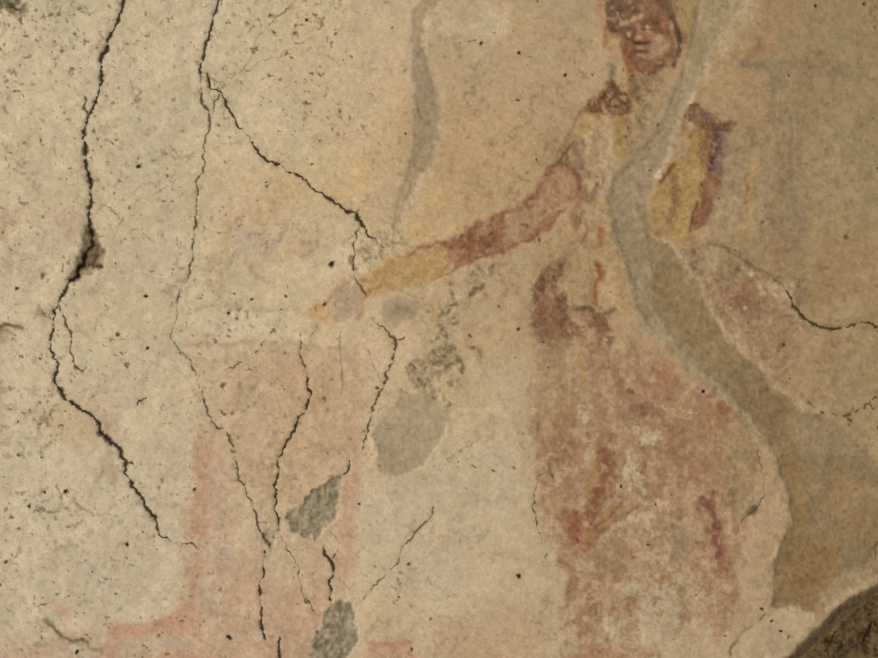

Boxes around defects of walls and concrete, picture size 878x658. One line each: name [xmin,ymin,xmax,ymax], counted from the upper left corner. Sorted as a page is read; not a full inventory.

crack [48,0,439,658]
crack [720,246,878,386]
crack [807,396,878,428]
crack [736,416,765,536]
spalling [763,572,878,658]